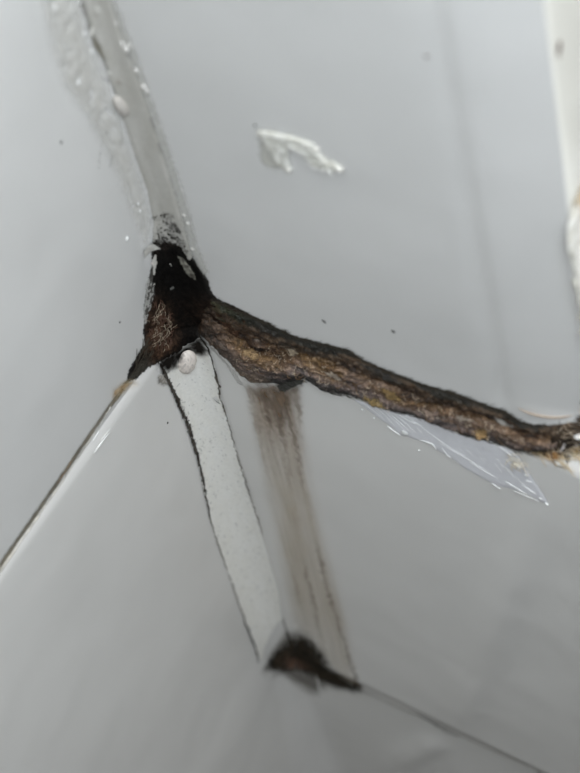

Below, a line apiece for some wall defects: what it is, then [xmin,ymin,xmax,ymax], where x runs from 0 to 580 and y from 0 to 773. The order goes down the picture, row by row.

crack [158,363,259,663]
crack [199,336,263,535]